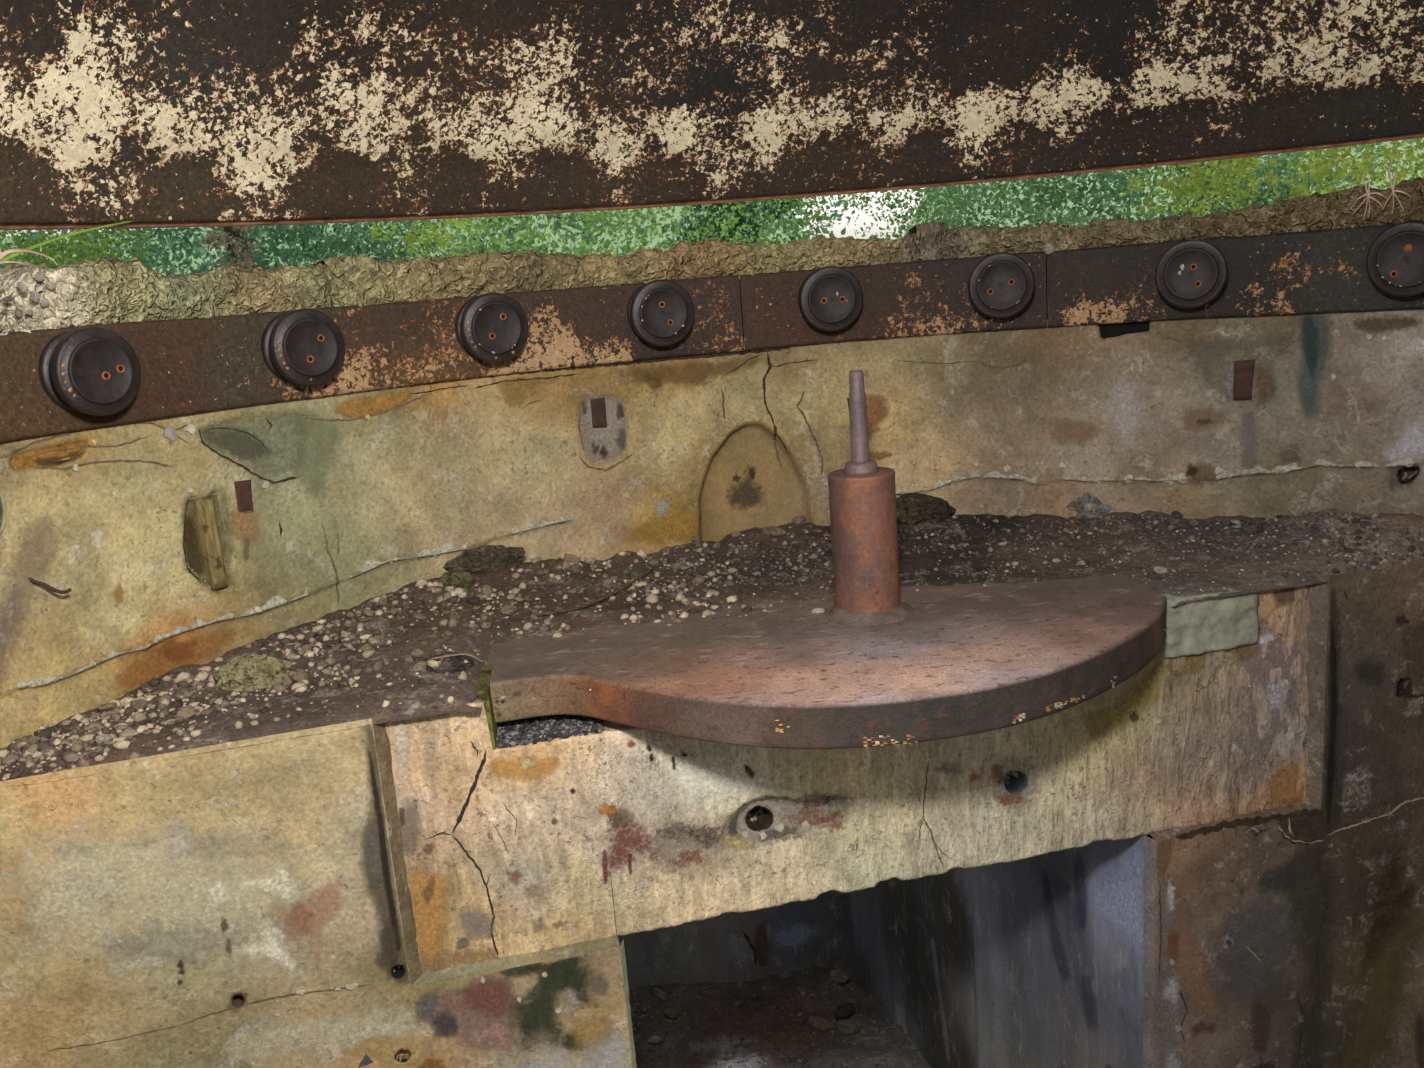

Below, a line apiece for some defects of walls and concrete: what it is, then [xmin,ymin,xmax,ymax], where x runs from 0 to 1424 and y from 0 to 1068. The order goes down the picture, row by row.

crack [366,347,824,476]
rust [620,360,756,388]
rust [867,397,889,459]
water stain [1300,315,1336,416]
crack [322,524,339,603]
rust [491,758,556,779]
crack [427,740,517,959]
rust [600,805,658,883]